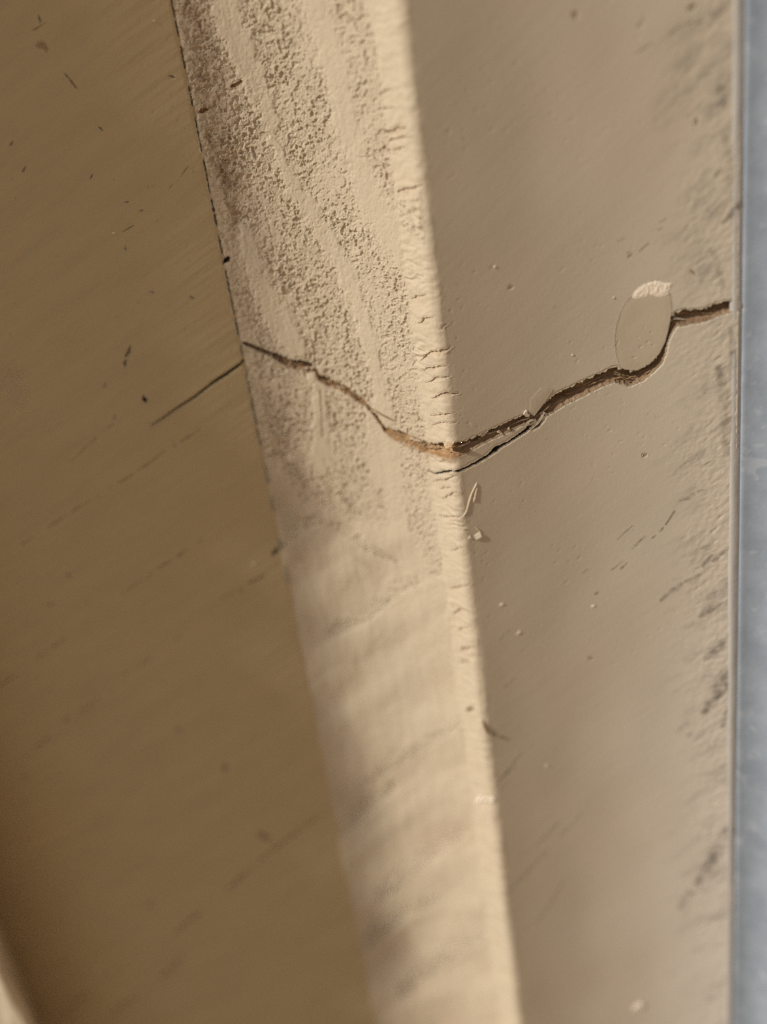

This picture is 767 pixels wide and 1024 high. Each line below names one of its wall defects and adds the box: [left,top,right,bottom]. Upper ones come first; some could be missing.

crack [151,0,740,521]
peeling [613,279,674,370]